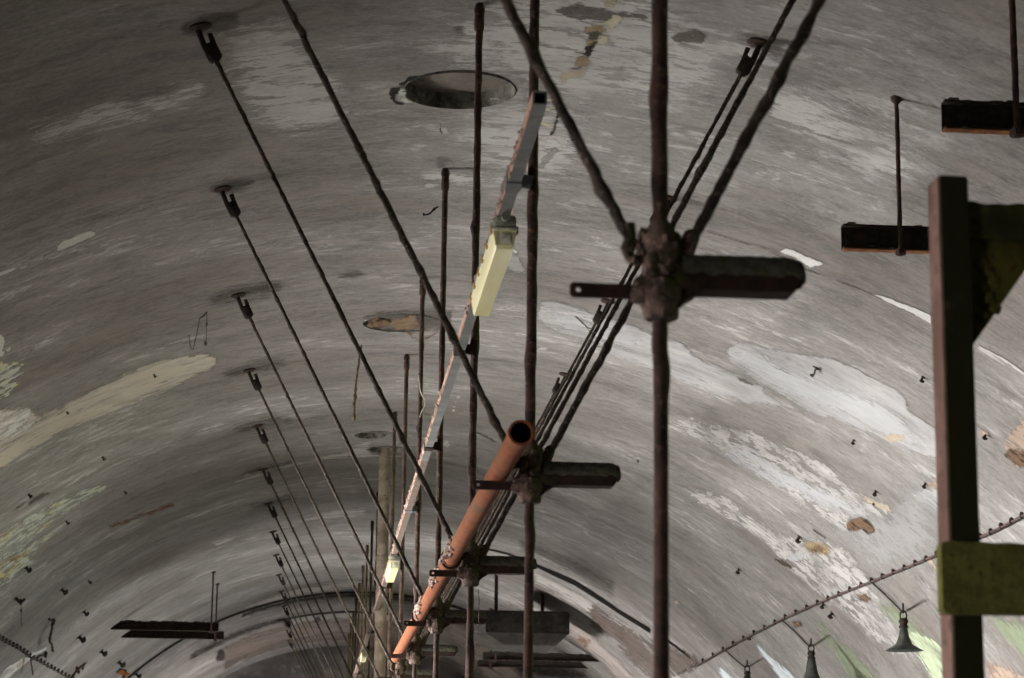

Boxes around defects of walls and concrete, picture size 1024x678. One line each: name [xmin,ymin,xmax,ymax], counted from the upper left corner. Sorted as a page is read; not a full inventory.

damp [672,31,706,44]
peeling [537,301,653,369]
peeling [0,334,216,467]
peeling [668,340,936,458]
spalling [1003,420,1024,468]
peeling [673,417,915,658]